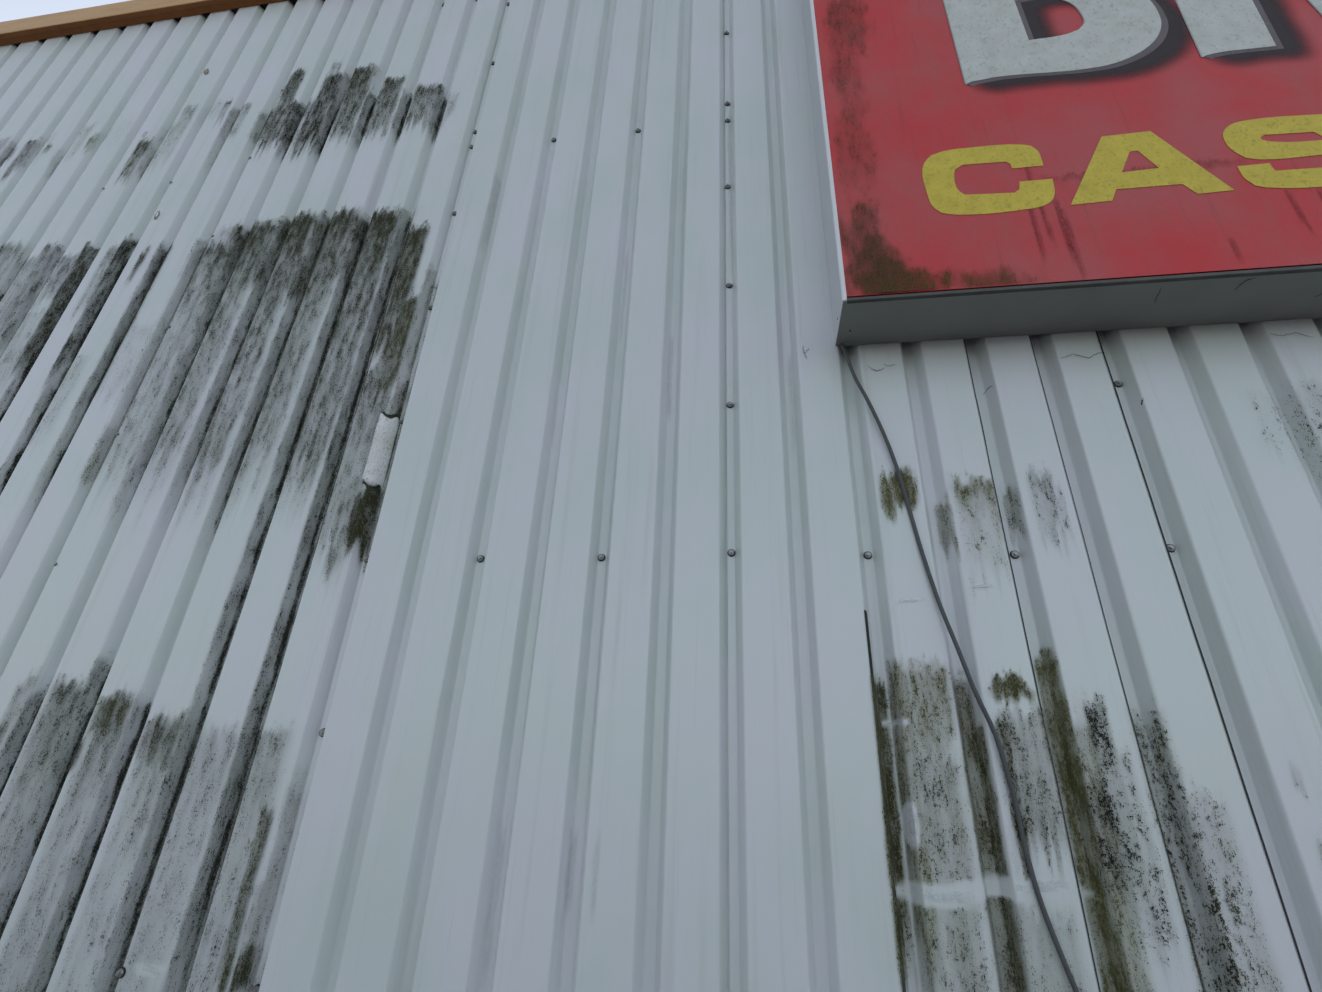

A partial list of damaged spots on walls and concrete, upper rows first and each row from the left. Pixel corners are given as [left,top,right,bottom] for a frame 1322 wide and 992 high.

leakage [211,61,455,160]
leakage [826,0,1037,294]
leakage [0,206,439,992]
leakage [879,466,918,522]
leakage [935,465,1071,576]
leakage [871,648,1282,992]